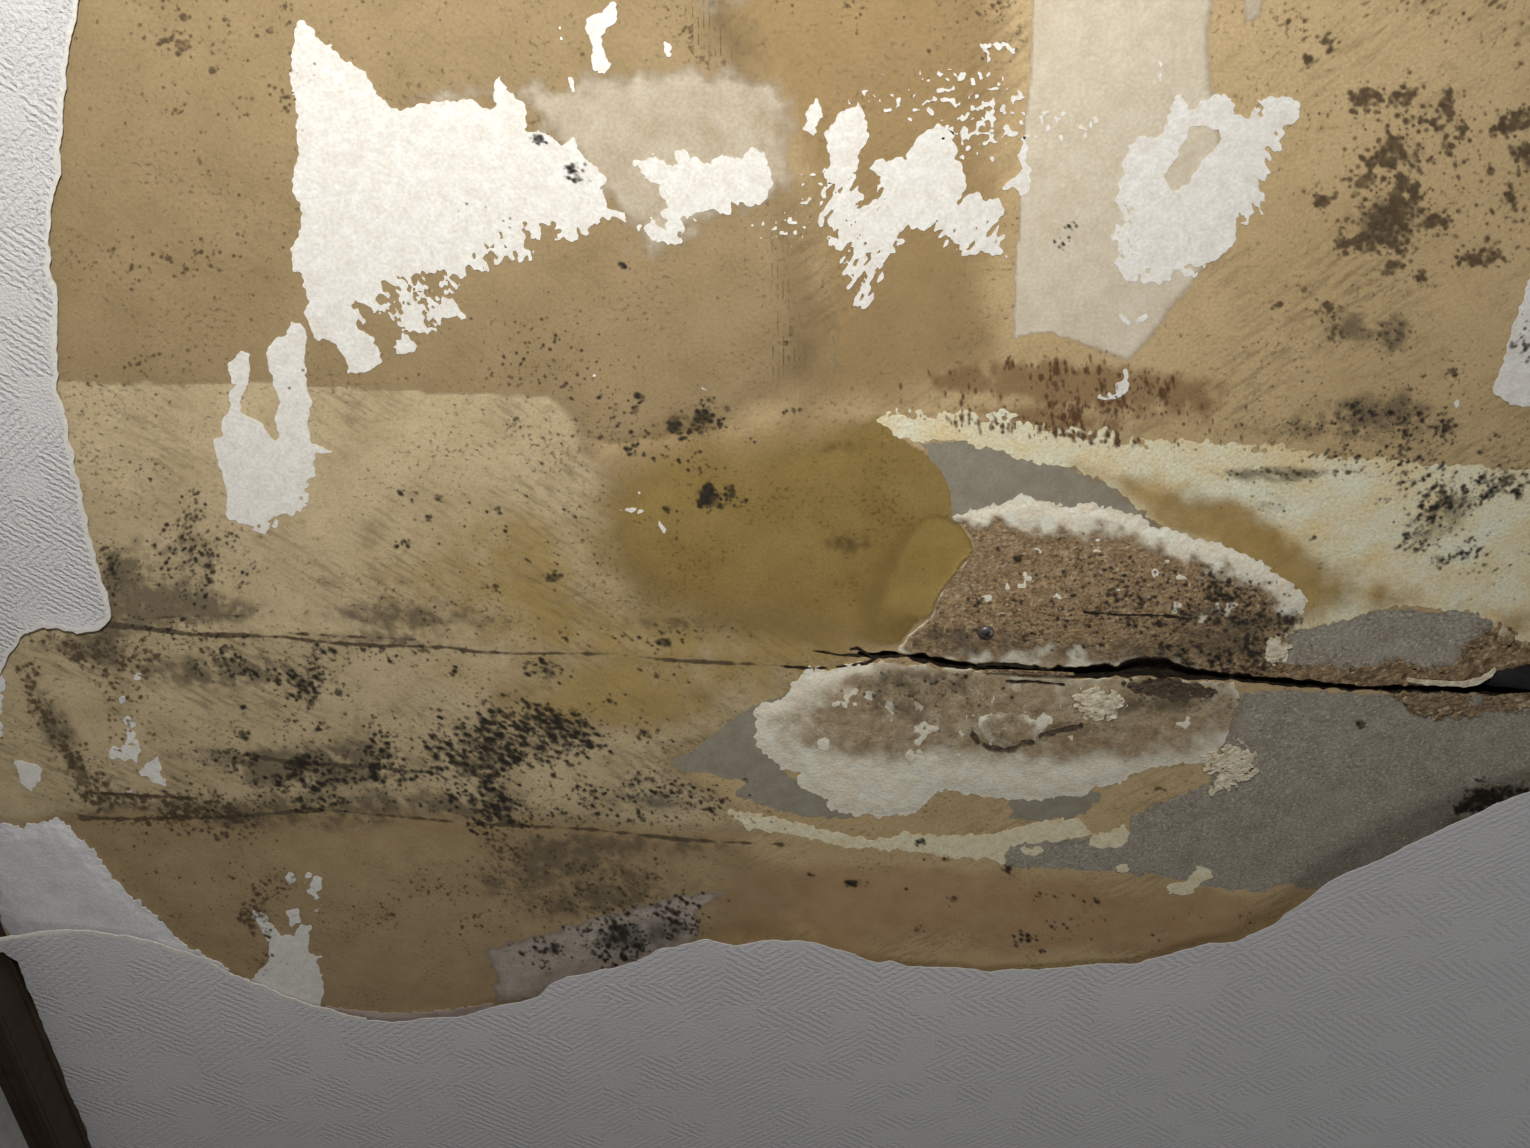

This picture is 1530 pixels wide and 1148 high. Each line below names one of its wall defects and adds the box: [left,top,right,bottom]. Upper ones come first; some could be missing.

peeling [585,1,617,74]
peeling [213,20,1111,534]
damp [49,0,1342,709]
peeling [1111,94,1300,285]
damp [1227,285,1530,580]
damp [1303,71,1530,285]
peeling [1492,279,1530,407]
crack [110,615,594,655]
damp [16,491,1250,1007]
crack [648,646,1530,696]
crack [1083,611,1192,620]
flaking render [753,493,1530,819]